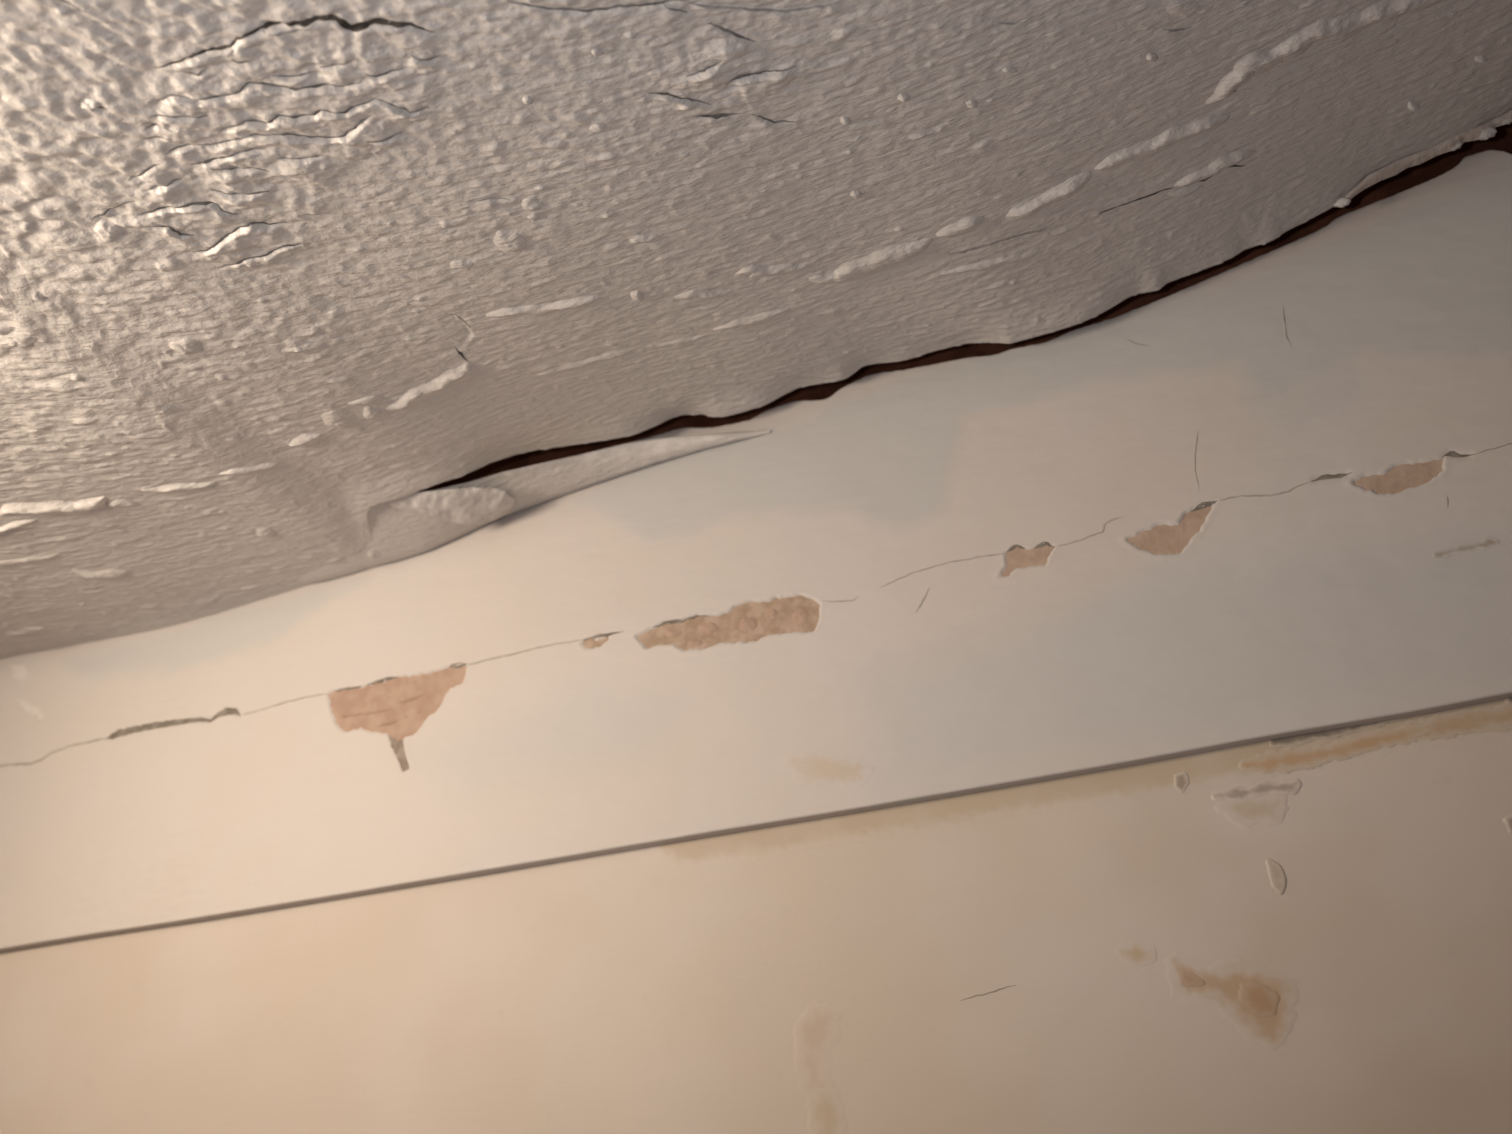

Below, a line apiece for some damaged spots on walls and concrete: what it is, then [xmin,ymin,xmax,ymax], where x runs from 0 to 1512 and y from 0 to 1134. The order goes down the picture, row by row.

crack [154,14,434,68]
crack [468,196,511,204]
crack [1099,165,1245,214]
crack [949,224,1053,256]
crack [448,312,468,362]
crack [1443,443,1512,457]
crack [1311,472,1352,482]
spalling [1353,457,1444,494]
spalling [1127,482,1309,555]
spalling [882,517,1123,587]
spalling [328,595,857,772]
crack [0,693,326,768]